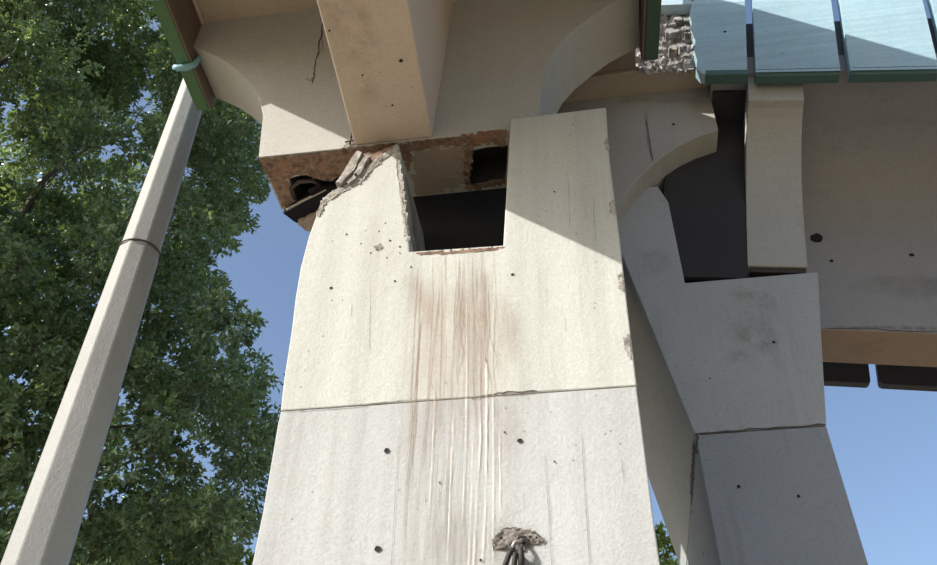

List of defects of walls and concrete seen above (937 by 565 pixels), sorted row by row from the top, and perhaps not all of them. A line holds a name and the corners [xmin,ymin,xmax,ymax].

crack [307,22,323,84]
spalling [634,14,696,75]
peeling [290,129,508,258]
crack [290,399,415,411]
crack [447,388,579,399]
crack [694,423,827,455]